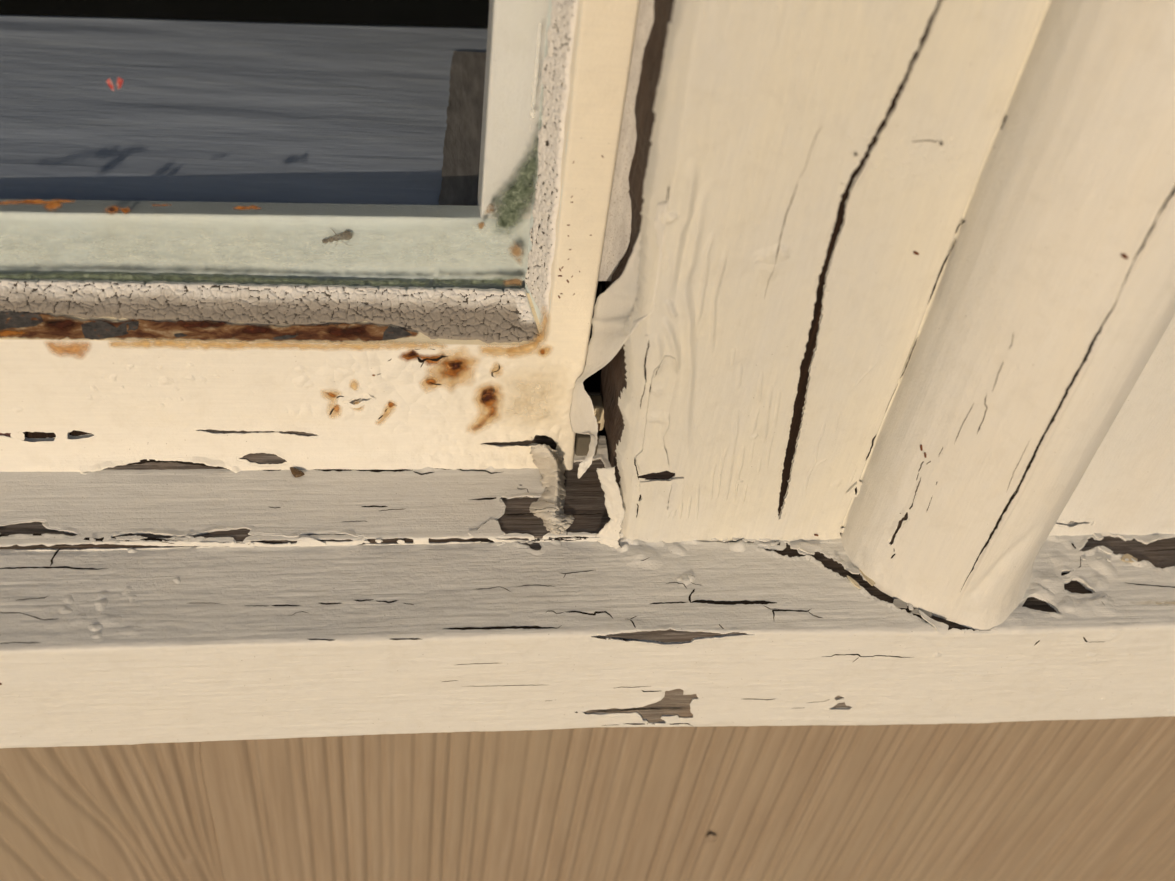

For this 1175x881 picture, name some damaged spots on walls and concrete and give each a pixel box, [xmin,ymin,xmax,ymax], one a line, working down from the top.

crack [2,0,574,378]
crack [618,0,950,551]
rust [0,312,549,387]
rust [326,382,357,415]
rust [472,386,500,430]
peeling [468,202,684,555]
peeling [0,520,383,547]
peeling [1075,533,1175,572]
crack [187,599,413,641]
crack [446,570,822,631]
peeling [1013,565,1101,619]
peeling [575,686,700,726]